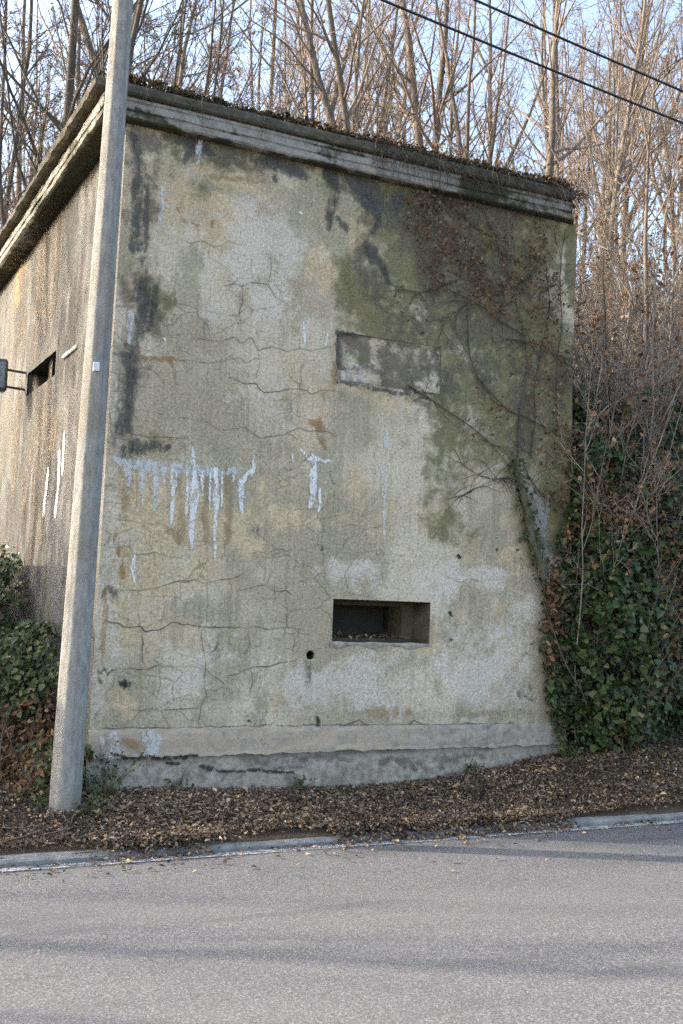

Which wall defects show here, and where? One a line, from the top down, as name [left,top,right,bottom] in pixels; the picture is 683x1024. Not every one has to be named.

water stain [129,133,164,258]
water stain [323,168,402,285]
water stain [115,271,171,459]
crack [123,257,334,458]
water stain [335,330,439,396]
water stain [9,365,65,569]
water stain [170,447,256,560]
rust [309,418,326,448]
crack [106,518,535,729]